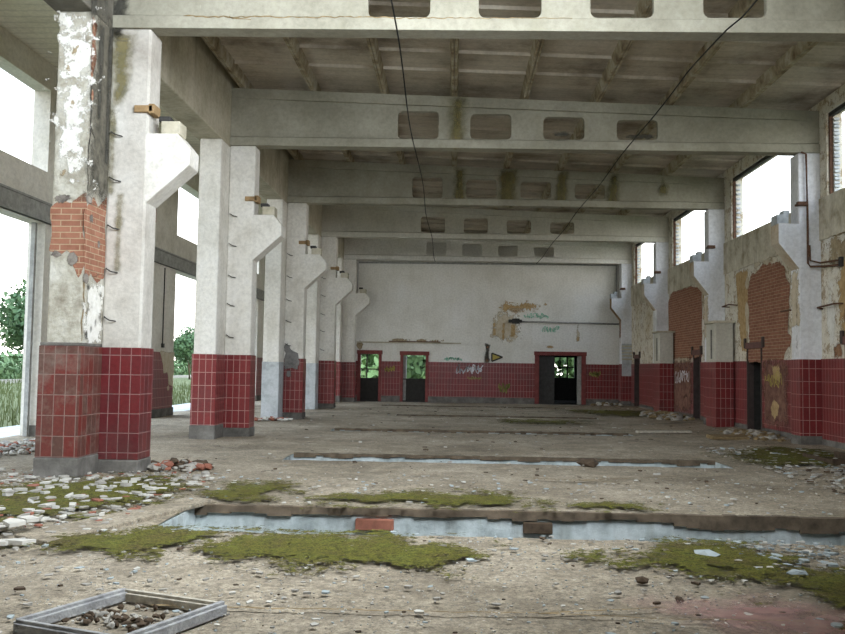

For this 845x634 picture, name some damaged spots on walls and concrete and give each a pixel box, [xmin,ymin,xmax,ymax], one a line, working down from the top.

water stain [86,0,131,204]
peeling [49,6,107,343]
peeling [826,236,845,272]
peeling [490,300,547,342]
peeling [827,294,845,357]